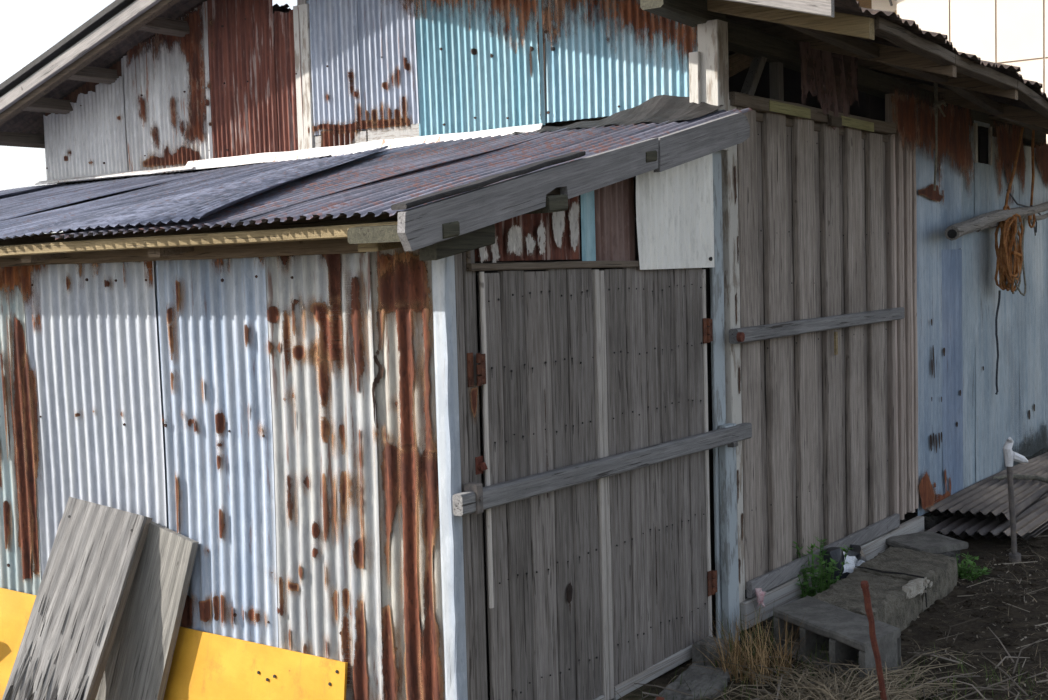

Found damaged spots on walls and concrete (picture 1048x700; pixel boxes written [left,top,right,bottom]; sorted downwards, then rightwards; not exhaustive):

corrosion [126,4,207,168]
corrosion [308,71,411,147]
corrosion [382,57,410,90]
corrosion [402,0,698,119]
peeling [478,199,579,263]
corrosion [267,254,366,454]
corrosion [0,265,45,580]
corrosion [215,412,225,470]
corrosion [286,475,309,521]
corrosion [375,251,445,700]
corrosion [181,565,303,628]
corrosion [312,429,369,700]